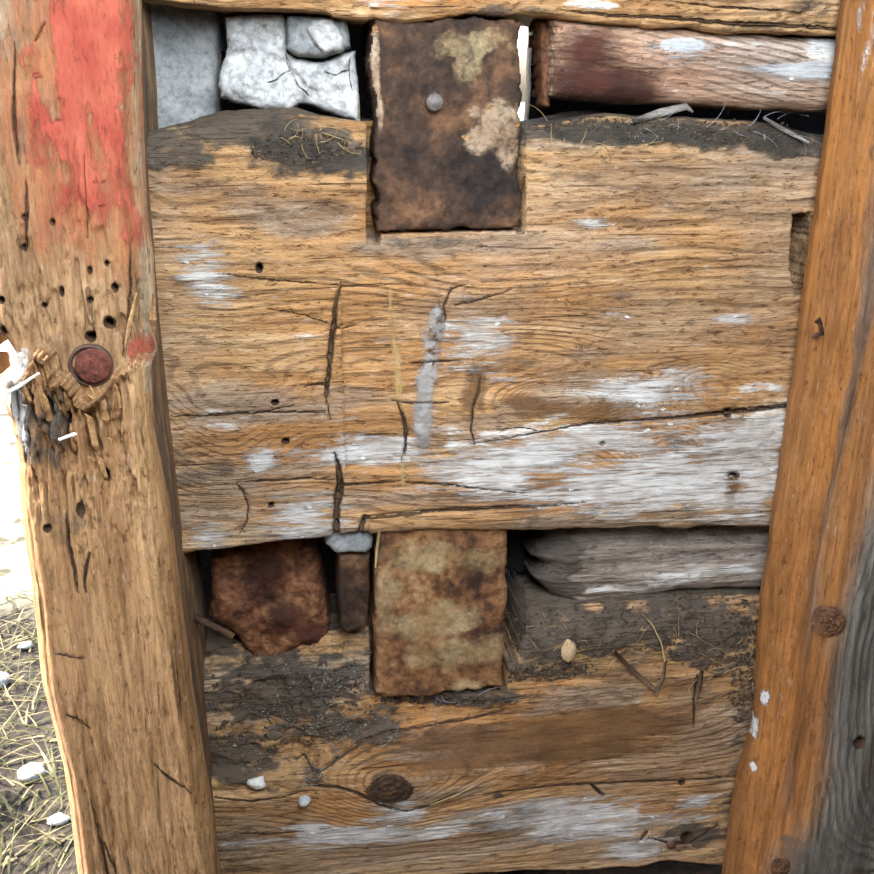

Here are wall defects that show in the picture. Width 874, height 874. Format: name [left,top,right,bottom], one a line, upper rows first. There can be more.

peeling [27,0,143,246]
peeling [6,349,28,449]
crack [171,273,381,420]
crack [413,358,464,366]
crack [443,282,510,320]
crack [469,379,787,444]
crack [236,400,584,535]